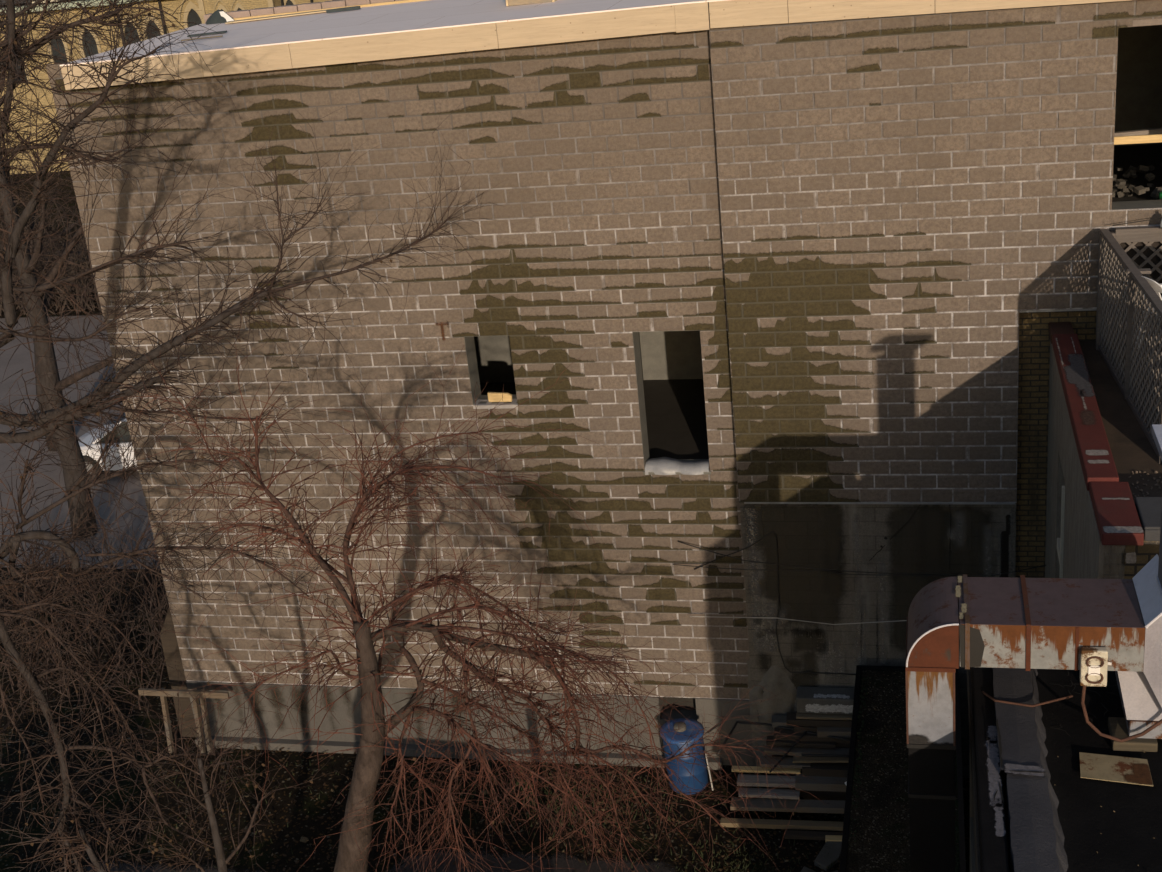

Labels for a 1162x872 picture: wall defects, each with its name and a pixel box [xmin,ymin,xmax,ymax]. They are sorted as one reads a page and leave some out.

damp [228,41,744,200]
damp [777,21,1055,74]
damp [392,231,971,689]
damp [878,505,993,666]